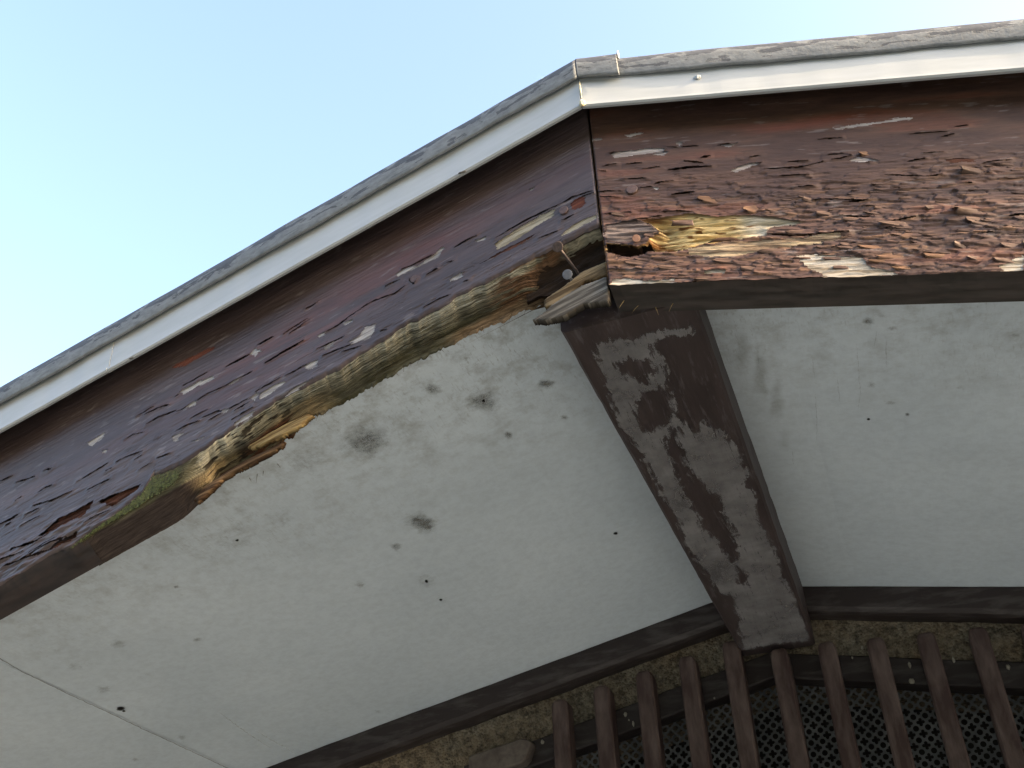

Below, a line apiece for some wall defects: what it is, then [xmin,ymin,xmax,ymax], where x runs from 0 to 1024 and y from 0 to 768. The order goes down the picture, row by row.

peeling [833,117,912,130]
peeling [611,141,684,158]
peeling [849,151,879,162]
peeling [475,209,556,264]
peeling [561,197,628,236]
peeling [609,158,1024,285]
peeling [396,247,444,276]
peeling [349,323,377,344]
peeling [178,376,215,407]
peeling [234,331,334,428]
peeling [592,326,809,650]
peeling [41,486,139,550]